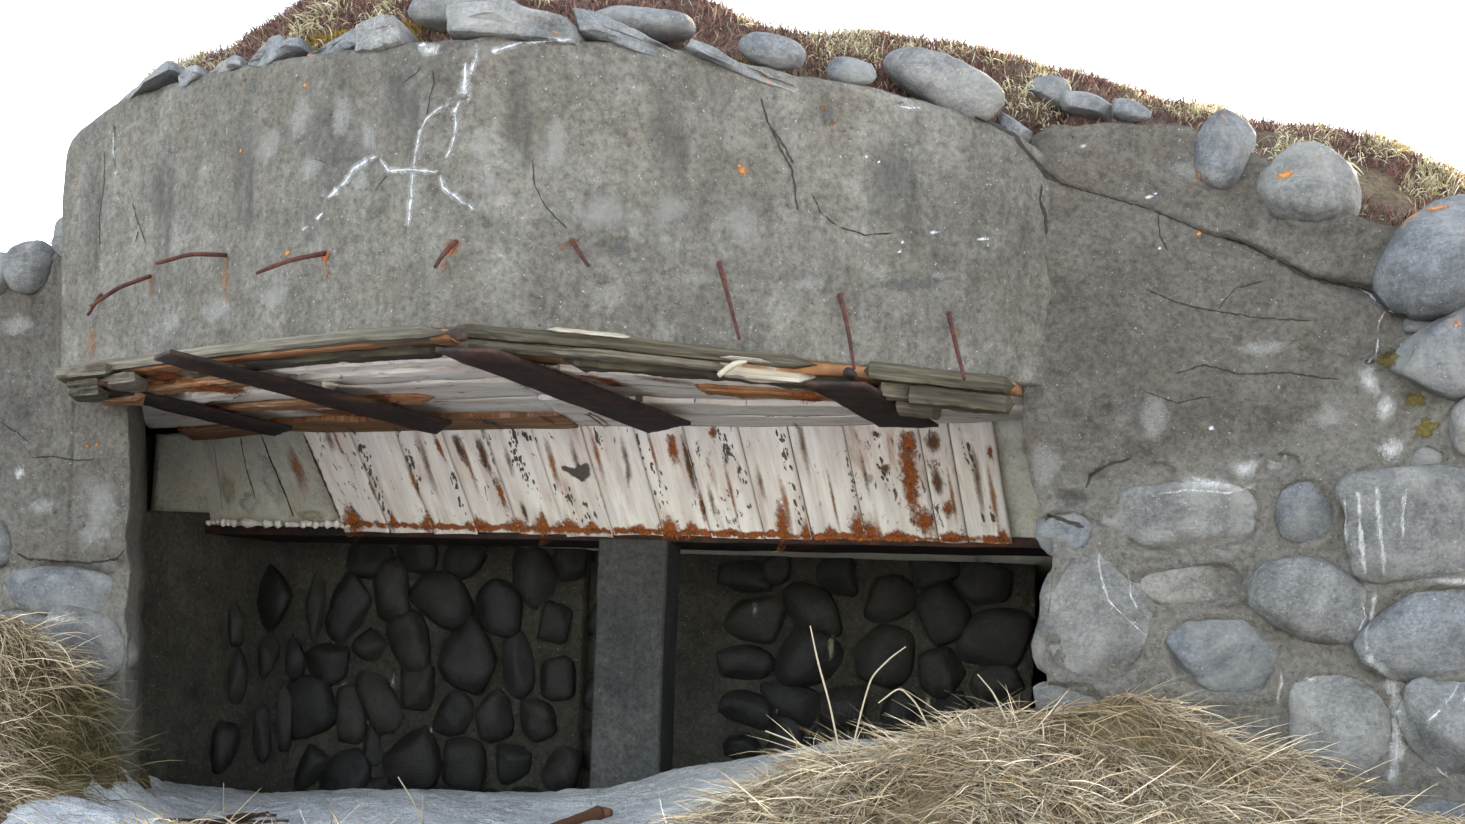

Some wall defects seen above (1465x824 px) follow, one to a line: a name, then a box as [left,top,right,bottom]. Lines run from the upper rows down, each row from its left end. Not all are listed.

crack [761,99,891,236]
crack [975,116,1408,321]
corrosion [140,371,246,397]
corrosion [579,375,687,387]
corrosion [791,392,822,404]
crack [1147,364,1336,403]
peeling [469,415,598,523]
peeling [636,433,668,509]
corrosion [304,431,1011,549]
peeling [714,426,747,484]
peeling [775,429,804,527]
peeling [845,431,890,510]